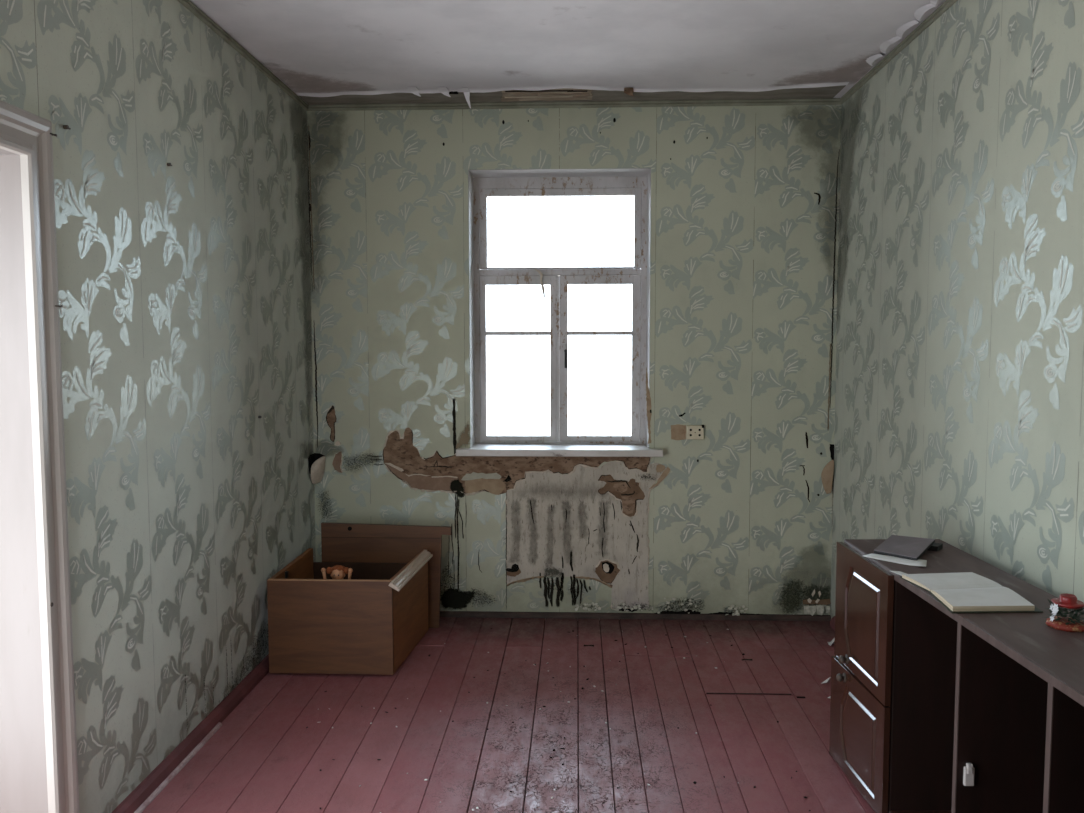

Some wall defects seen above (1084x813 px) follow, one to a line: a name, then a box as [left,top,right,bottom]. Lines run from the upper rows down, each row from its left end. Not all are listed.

spalling [308,453,324,474]
peeling [385,463,512,497]
flaking render [598,474,645,518]
leakage [539,552,591,607]